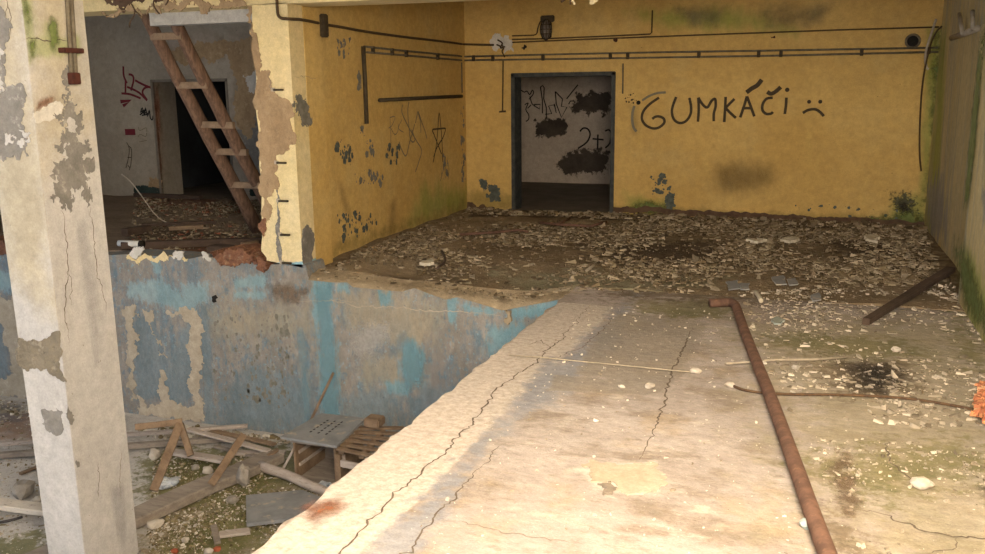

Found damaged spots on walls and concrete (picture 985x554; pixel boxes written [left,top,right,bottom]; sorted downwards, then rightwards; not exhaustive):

peeling [0,6,31,162]
spalling [101,0,313,273]
spalling [337,210,377,243]
damp [889,190,919,215]
spalling [0,293,67,399]
spalling [41,408,74,436]
peeling [121,304,205,423]
spalling [308,268,570,325]
crack [338,308,615,554]
crack [640,330,692,458]
crack [855,509,985,554]